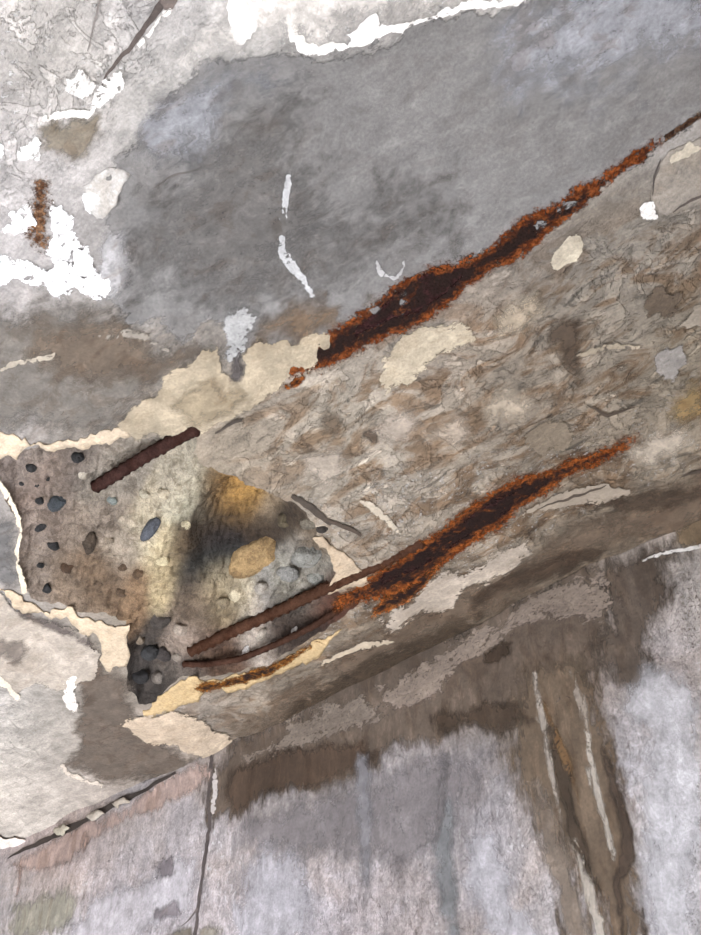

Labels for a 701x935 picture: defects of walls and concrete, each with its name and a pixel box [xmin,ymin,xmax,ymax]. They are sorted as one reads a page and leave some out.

spalling [82,0,701,352]
corrosion [284,113,701,390]
spalling [0,332,371,758]
leakage [321,413,340,435]
leakage [363,430,377,444]
peeling [379,321,476,395]
corrosion [332,433,639,619]
leakage [548,318,582,377]
peeling [642,544,701,562]
leakage [199,473,701,935]
crack [8,771,176,859]
crack [180,755,218,935]